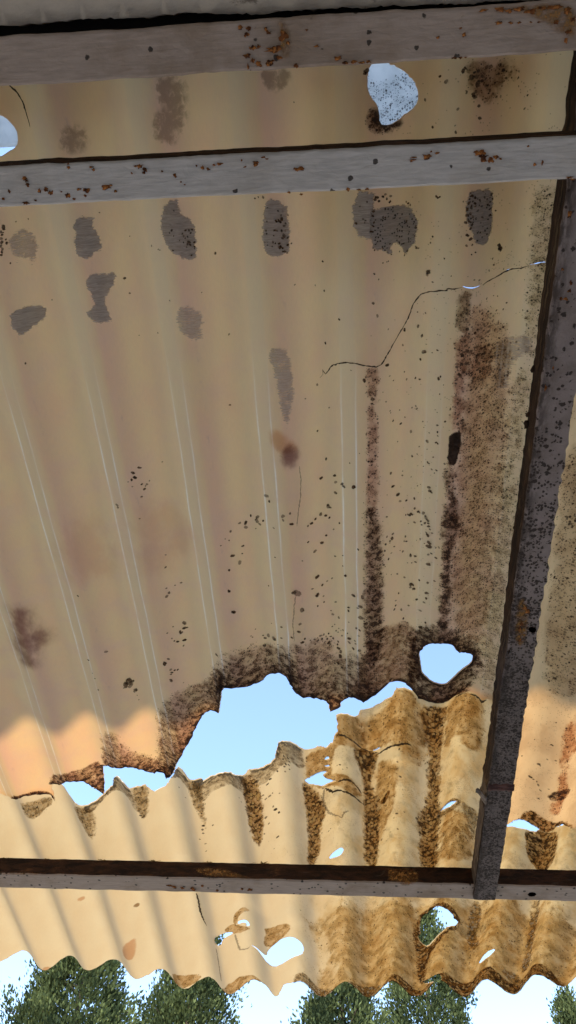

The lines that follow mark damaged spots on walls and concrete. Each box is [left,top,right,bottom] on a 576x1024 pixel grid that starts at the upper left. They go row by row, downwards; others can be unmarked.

damp [460,58,529,120]
crack [323,266,527,374]
damp [11,188,555,801]
crack [337,734,411,754]
crack [322,779,363,818]